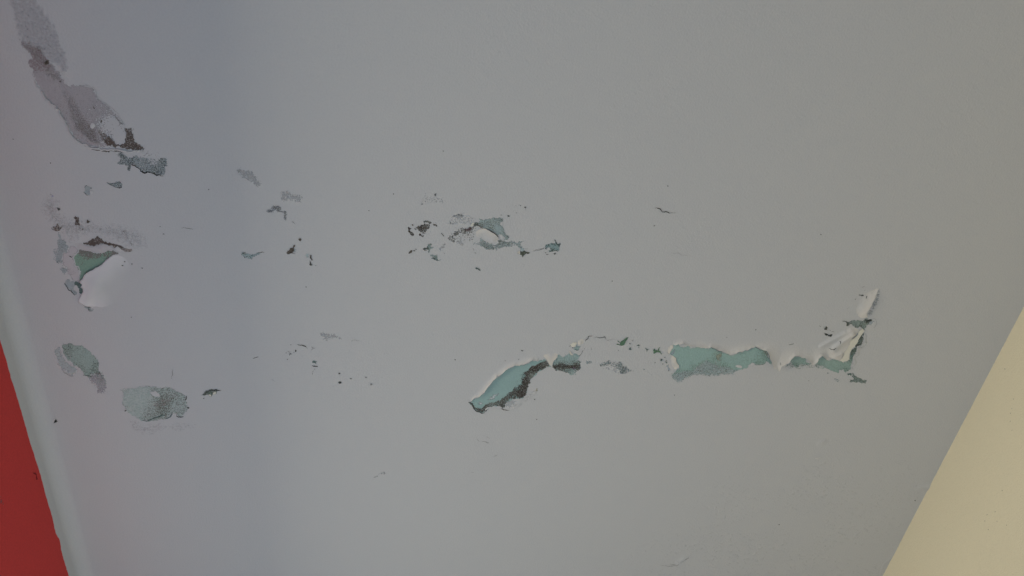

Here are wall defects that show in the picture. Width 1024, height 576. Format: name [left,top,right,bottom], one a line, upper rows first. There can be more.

peeling [21,41,167,175]
peeling [52,216,143,312]
peeling [448,214,561,257]
peeling [55,343,106,393]
peeling [121,386,189,422]
peeling [468,339,584,414]
peeling [616,318,877,384]